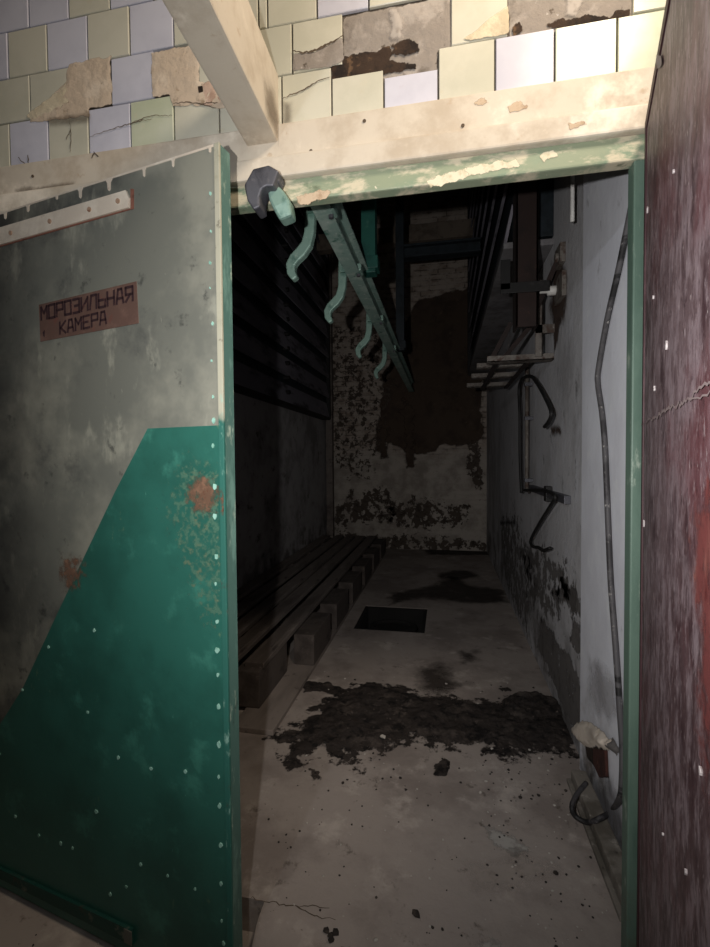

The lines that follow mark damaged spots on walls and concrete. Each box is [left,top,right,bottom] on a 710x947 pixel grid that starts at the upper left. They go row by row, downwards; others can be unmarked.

spalling [292,0,451,79]
spalling [465,0,632,40]
spalling [27,56,113,122]
spalling [151,45,225,109]
peeling [297,189,330,205]
peeling [427,159,520,187]
peeling [540,150,558,162]
peeling [333,321,487,551]